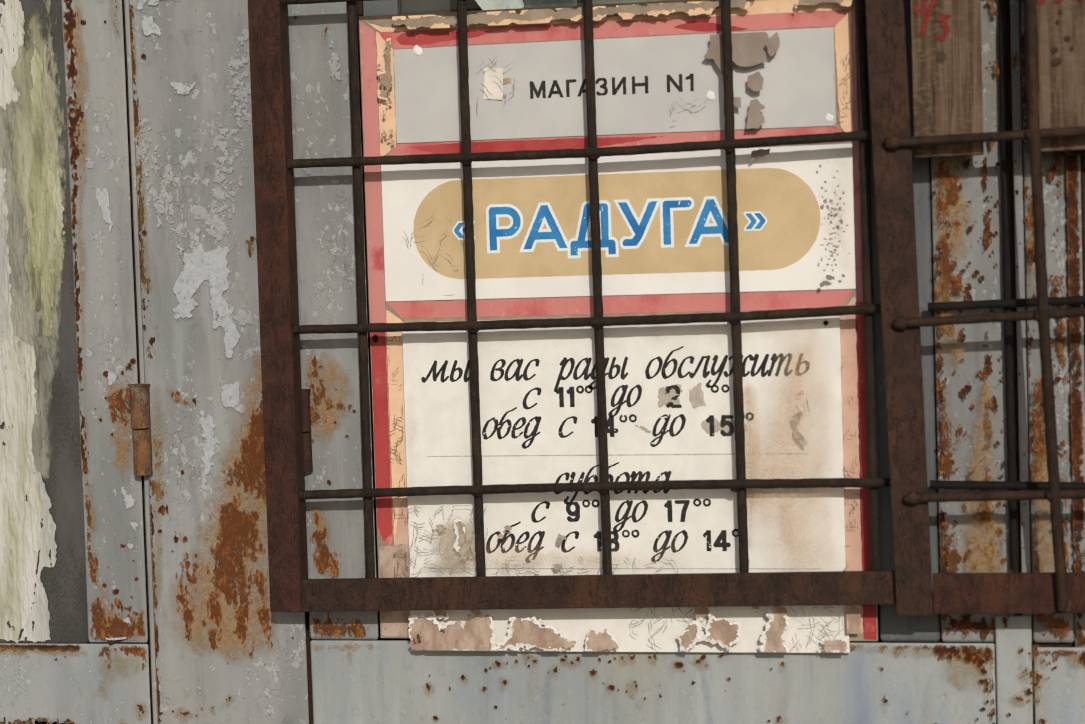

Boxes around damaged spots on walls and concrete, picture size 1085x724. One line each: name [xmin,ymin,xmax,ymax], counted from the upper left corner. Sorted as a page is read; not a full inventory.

peeling [0,0,66,643]
rust [0,644,81,661]
rust [63,0,86,391]
rust [95,358,136,467]
rust [79,404,168,724]
rust [104,1,158,358]
peeling [134,29,253,362]
rust [171,359,273,659]
rust [310,508,342,579]
rust [851,614,1009,724]
rust [932,142,1008,573]
rust [1015,152,1084,482]